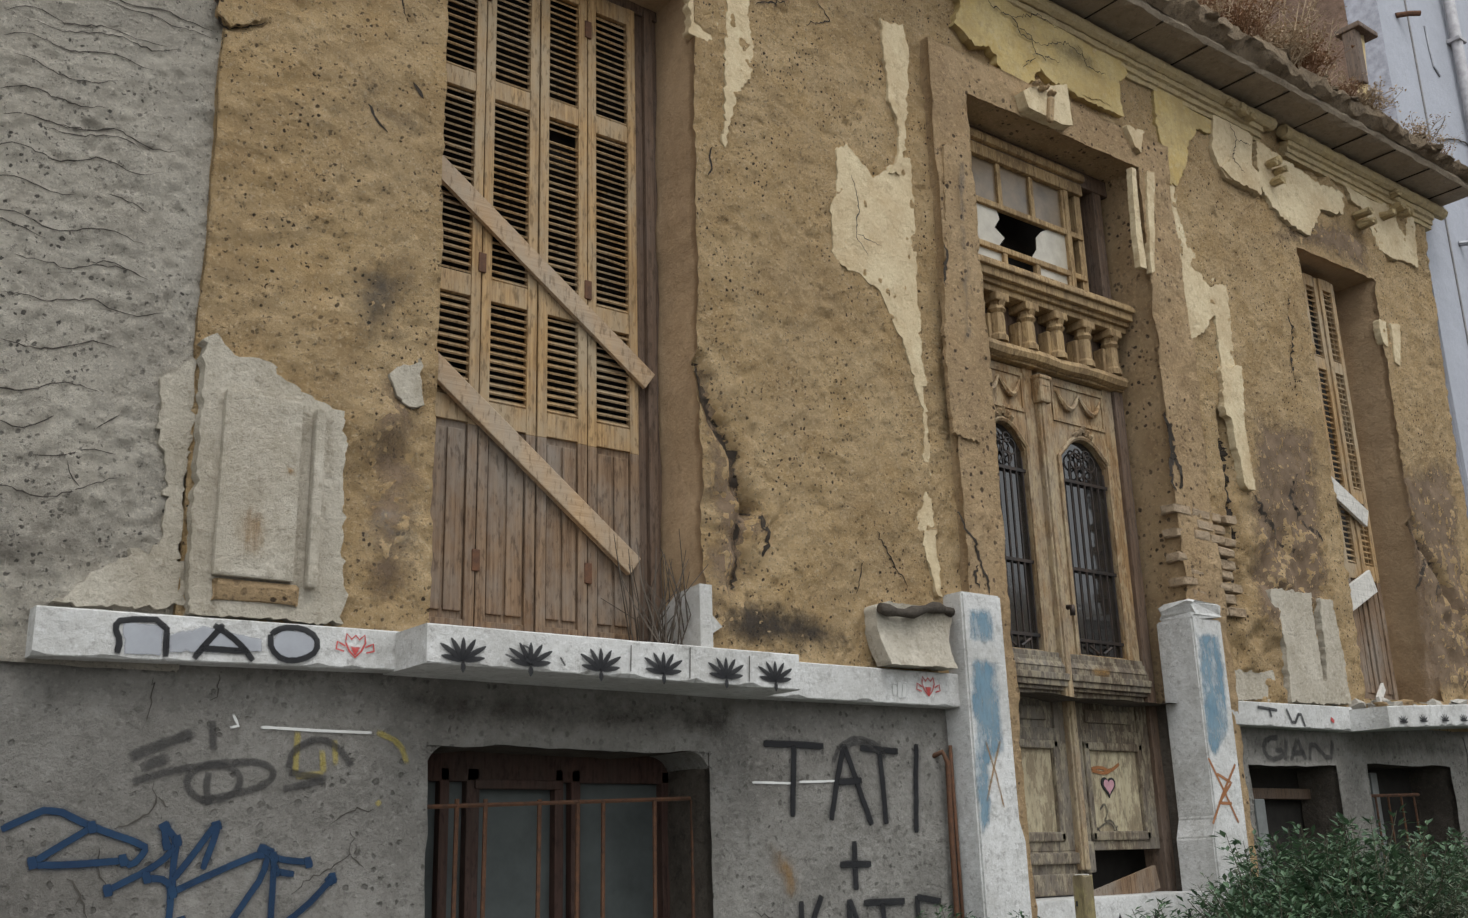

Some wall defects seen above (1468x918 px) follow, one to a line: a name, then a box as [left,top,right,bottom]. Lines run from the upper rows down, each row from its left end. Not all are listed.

crack [988,0,1105,75]
spalling [1281,224,1367,268]
crack [693,363,771,590]
spalling [1160,419,1327,622]